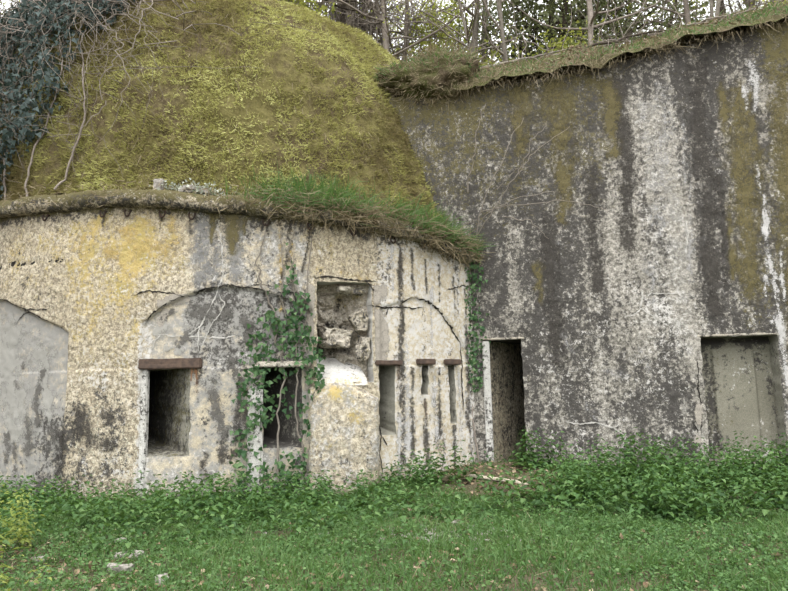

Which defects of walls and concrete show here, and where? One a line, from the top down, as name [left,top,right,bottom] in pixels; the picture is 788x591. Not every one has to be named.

damp [741,59,761,111]
damp [53,404,117,478]
crack [134,222,464,412]
damp [390,243,472,475]
damp [532,211,574,367]
damp [581,165,606,295]
damp [602,57,737,317]
damp [756,168,788,386]